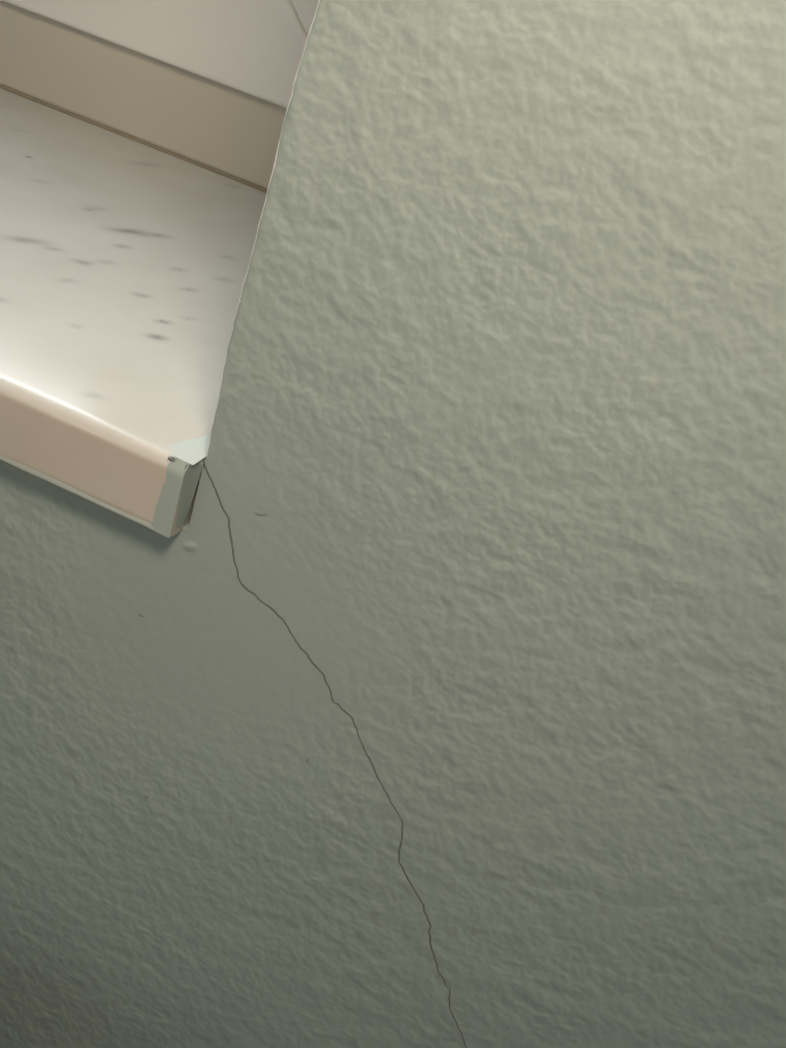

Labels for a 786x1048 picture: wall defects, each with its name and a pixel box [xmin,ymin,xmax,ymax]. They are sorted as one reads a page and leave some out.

crack [202,458,467,1048]